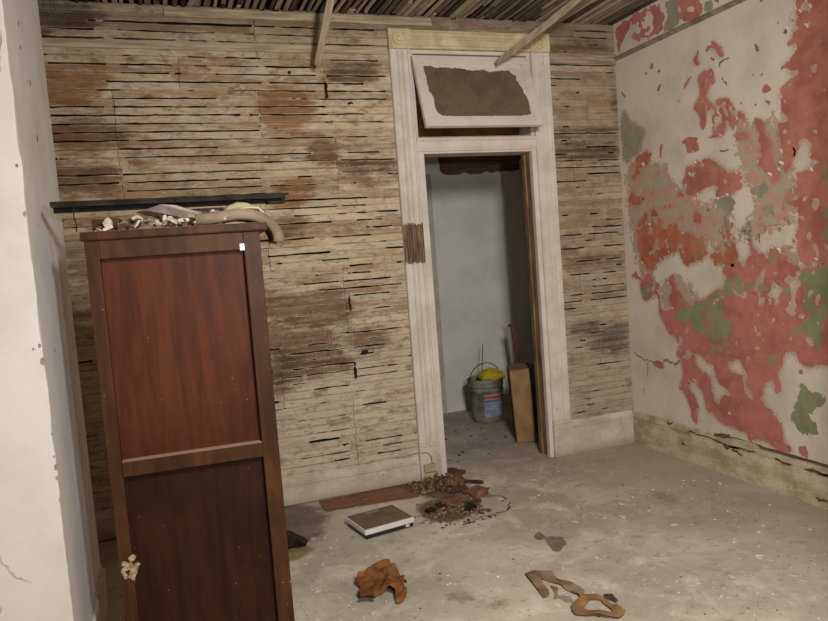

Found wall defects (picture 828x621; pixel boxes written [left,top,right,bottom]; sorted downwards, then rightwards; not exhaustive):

water stain [46,67,110,105]
water stain [257,86,315,135]
water stain [328,63,378,82]
flaking render [415,87,519,137]
water stain [52,119,128,192]
peeling [615,0,828,477]
water stain [265,290,385,393]
crack [0,558,32,583]